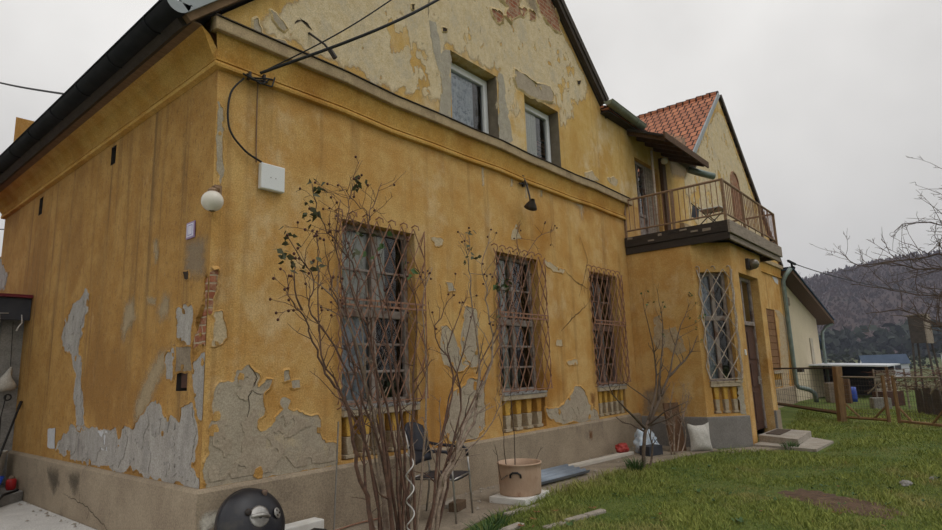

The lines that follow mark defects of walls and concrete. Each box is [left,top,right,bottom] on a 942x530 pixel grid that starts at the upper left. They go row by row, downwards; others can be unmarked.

peeling [251,0,587,143]
peeling [47,266,339,489]
peeling [438,304,486,444]
peeling [544,385,600,425]